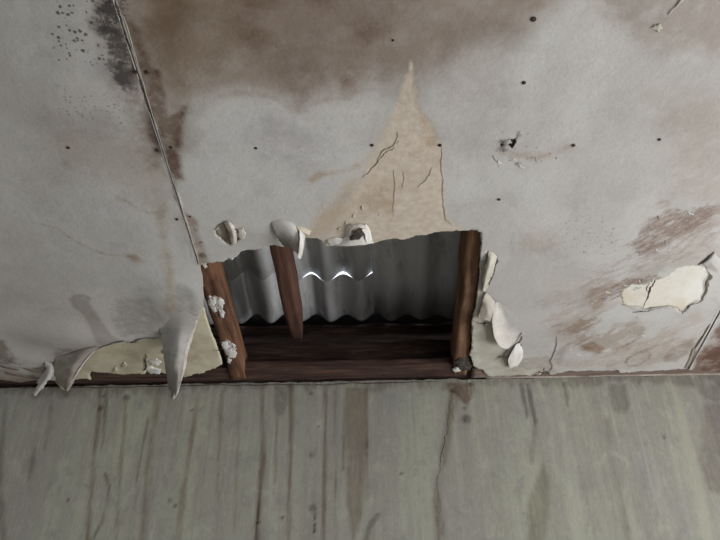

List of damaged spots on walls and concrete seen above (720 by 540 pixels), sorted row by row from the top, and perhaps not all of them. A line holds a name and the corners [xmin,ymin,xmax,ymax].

peeling [0,307,222,399]
peeling [271,220,311,259]
water stain [0,0,720,375]
peeling [326,58,465,247]
peeling [469,251,547,377]
peeling [621,252,720,314]
crack [434,388,455,535]